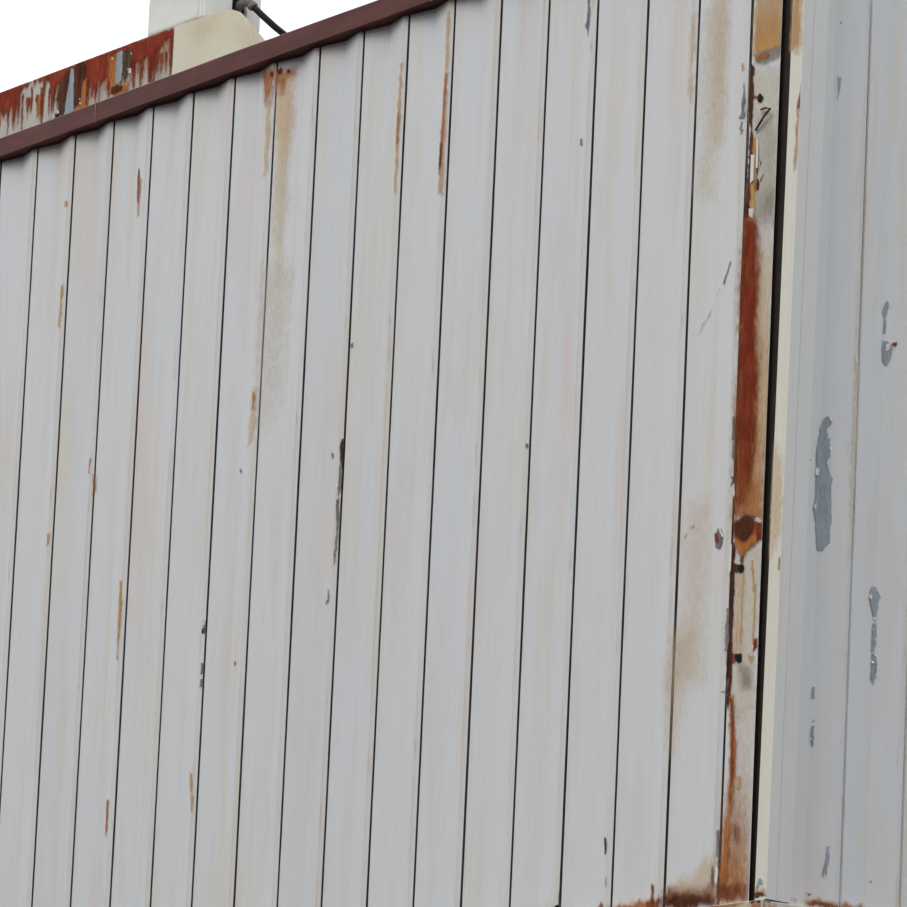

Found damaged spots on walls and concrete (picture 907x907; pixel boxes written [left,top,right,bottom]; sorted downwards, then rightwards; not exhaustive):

corrosion [0,28,174,132]
corrosion [262,68,293,188]
corrosion [438,53,448,192]
corrosion [732,218,769,575]
peeling [882,301,897,365]
peeling [813,414,833,551]
peeling [869,586,880,684]
corrosion [618,695,771,907]